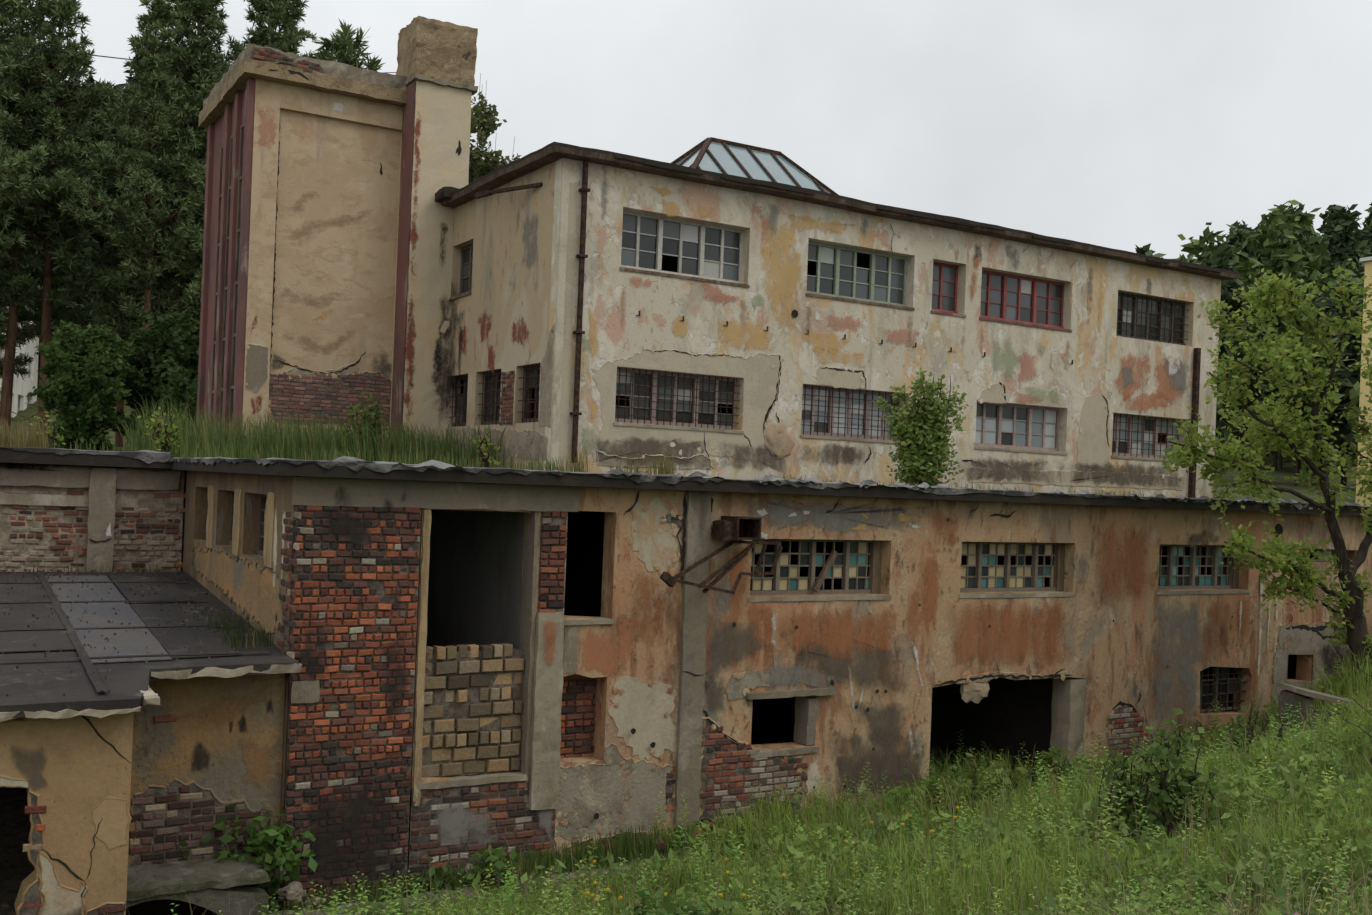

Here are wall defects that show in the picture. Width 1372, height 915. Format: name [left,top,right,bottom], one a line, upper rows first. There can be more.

crack [270,123,366,375]
flaking render [244,344,392,427]
damp [434,287,494,411]
damp [512,318,528,345]
flaking render [968,354,1188,491]
flaking render [629,496,685,576]
rust [867,559,939,672]
crack [80,715,130,763]
flaking render [554,674,679,856]
flaking render [699,716,815,824]
flaking render [0,774,126,915]
crack [42,818,103,898]